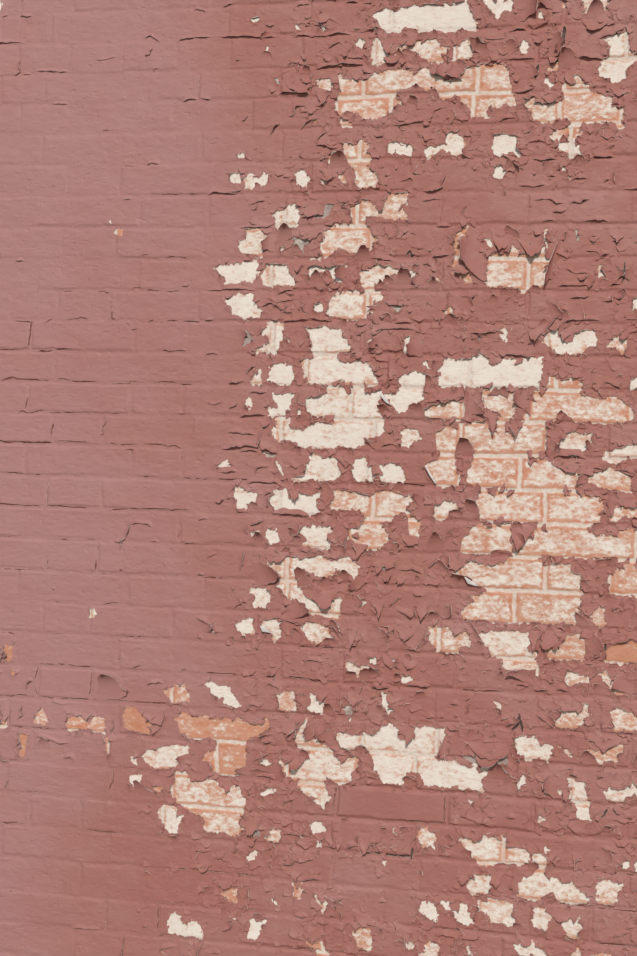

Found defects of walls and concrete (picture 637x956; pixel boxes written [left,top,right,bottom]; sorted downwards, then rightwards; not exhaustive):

peeling [124,0,637,900]
peeling [0,704,51,761]
peeling [165,875,270,952]
peeling [298,887,385,956]